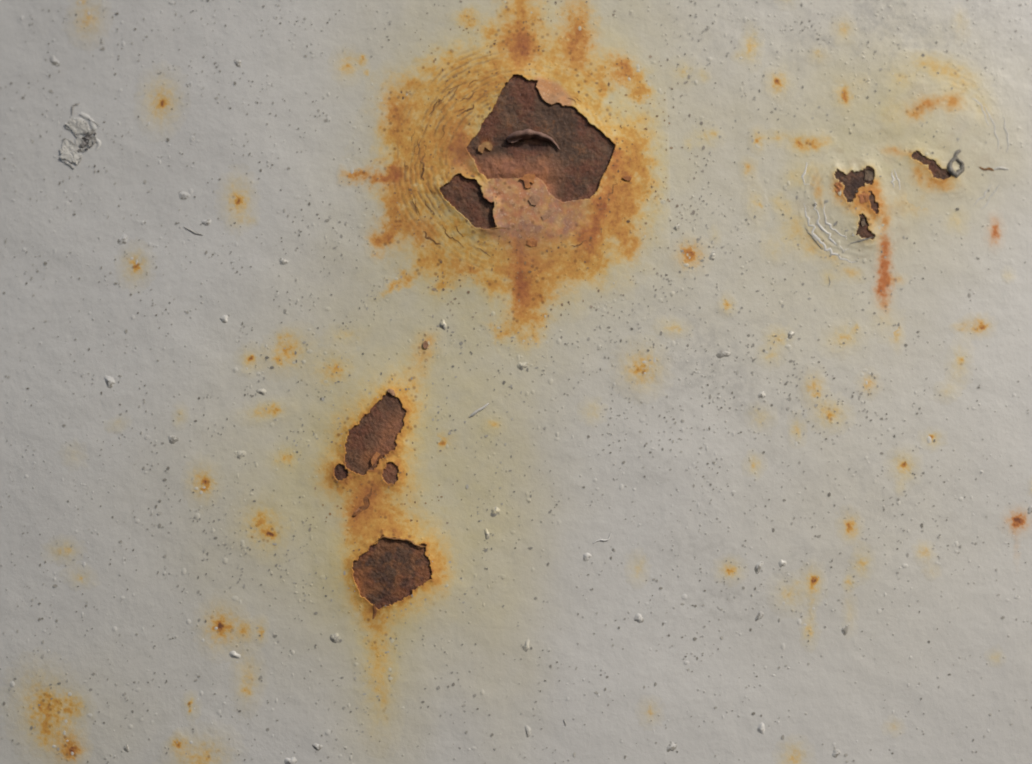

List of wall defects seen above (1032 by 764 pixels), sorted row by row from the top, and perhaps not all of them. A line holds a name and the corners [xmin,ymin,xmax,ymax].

corrosion [179,0,728,759]